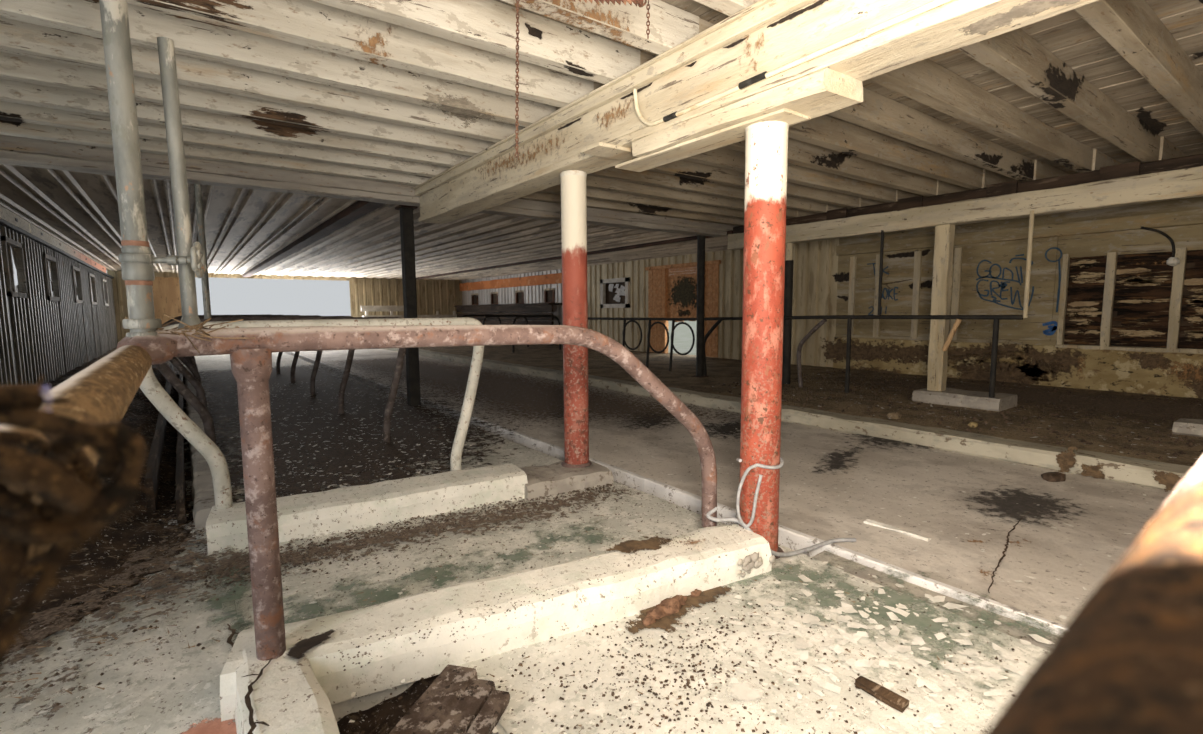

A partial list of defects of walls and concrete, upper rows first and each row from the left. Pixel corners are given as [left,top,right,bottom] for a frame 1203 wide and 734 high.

peeling [134,0,253,31]
damp [960,485,1083,526]
crack [980,511,1030,593]
crack [242,658,272,734]